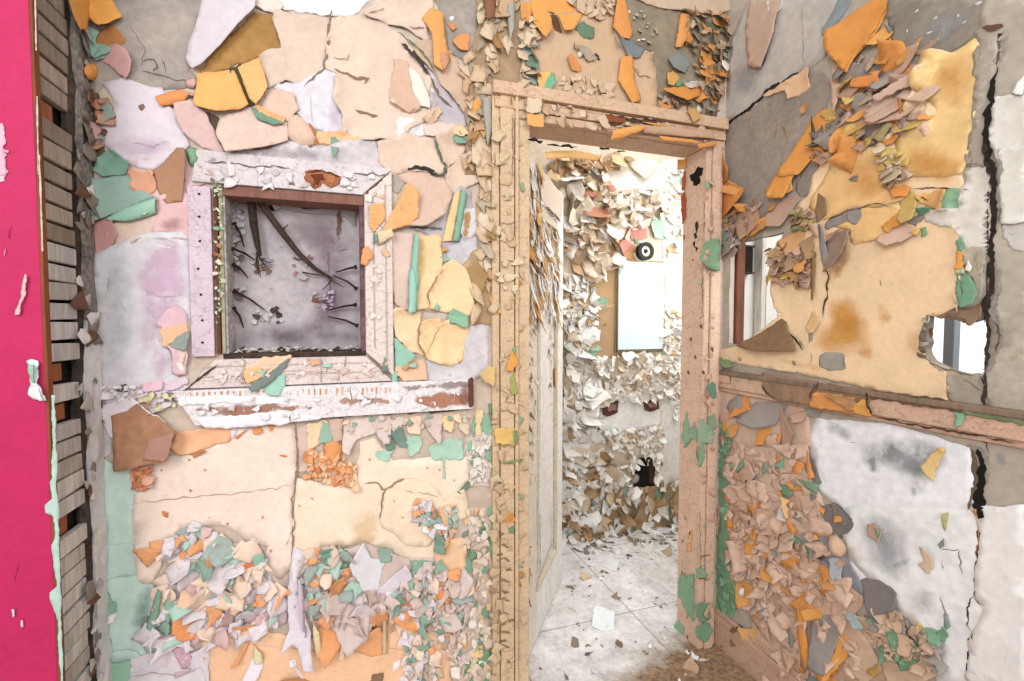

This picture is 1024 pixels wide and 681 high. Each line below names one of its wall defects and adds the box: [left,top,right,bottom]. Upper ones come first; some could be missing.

crack [982,23,1003,32]
crack [729,14,804,124]
peeling [68,0,371,255]
spalling [232,202,272,275]
crack [829,203,888,220]
crack [913,69,1005,405]
spalling [70,275,103,347]
peeling [360,0,1024,681]
crack [821,270,829,317]
corrosion [461,377,474,408]
peeling [101,305,535,681]
spalling [85,578,104,605]